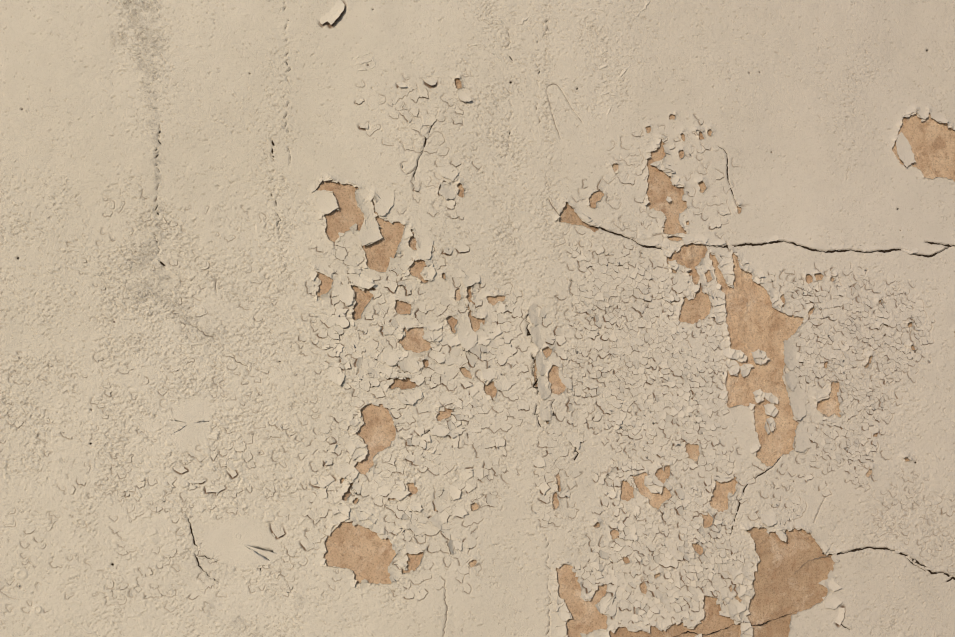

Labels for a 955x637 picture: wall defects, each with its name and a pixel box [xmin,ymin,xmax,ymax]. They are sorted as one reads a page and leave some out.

peeling [319,0,345,25]
peeling [379,71,472,219]
peeling [892,110,955,182]
crack [589,224,661,249]
crack [710,235,955,258]
crack [526,315,556,427]
peeling [299,114,935,637]
crack [730,457,781,534]
crack [794,547,955,582]
crack [674,611,796,637]